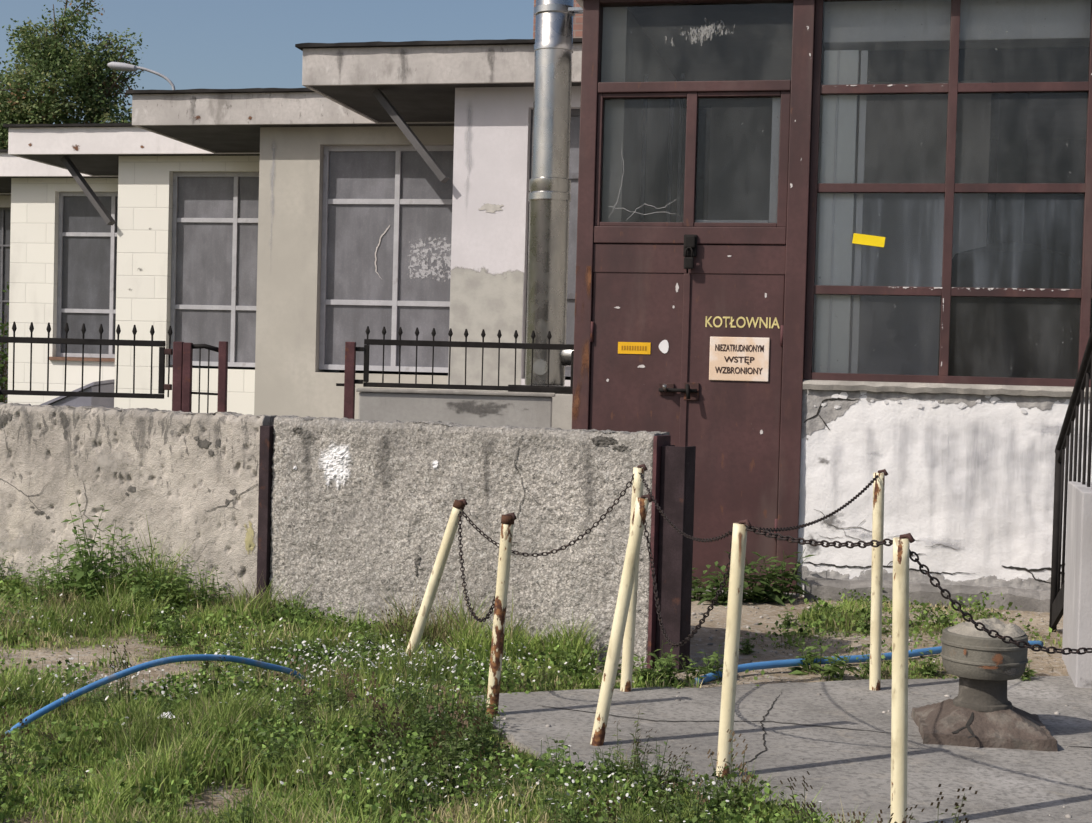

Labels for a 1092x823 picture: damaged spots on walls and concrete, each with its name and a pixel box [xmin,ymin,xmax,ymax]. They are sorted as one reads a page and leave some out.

crack [804,398,860,430]
peeling [802,389,1071,440]
crack [2,479,47,513]
peeling [797,565,893,581]
peeling [909,570,1065,591]